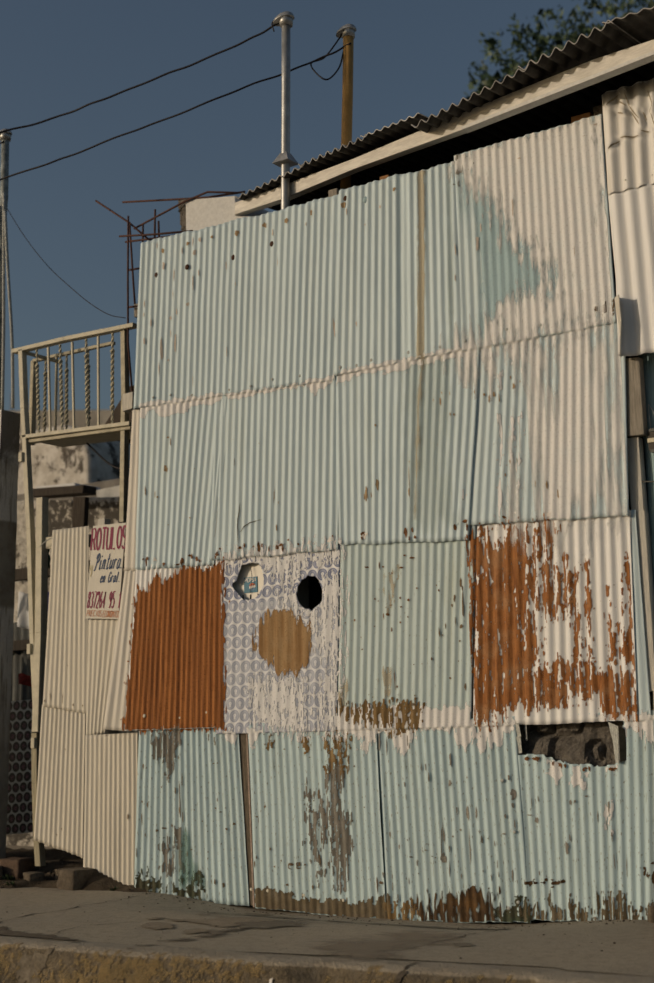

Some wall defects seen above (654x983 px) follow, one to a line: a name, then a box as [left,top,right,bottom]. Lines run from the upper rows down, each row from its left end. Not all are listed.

peeling [139,115,632,556]
corrosion [122,548,230,735]
corrosion [252,608,312,678]
peeling [208,525,515,765]
corrosion [453,513,639,736]
corrosion [323,667,425,782]
peeling [142,726,195,878]
peeling [255,762,399,919]
crack [380,926,497,983]
corrosion [382,883,507,923]
peeling [425,775,516,879]
corrosion [519,890,654,922]